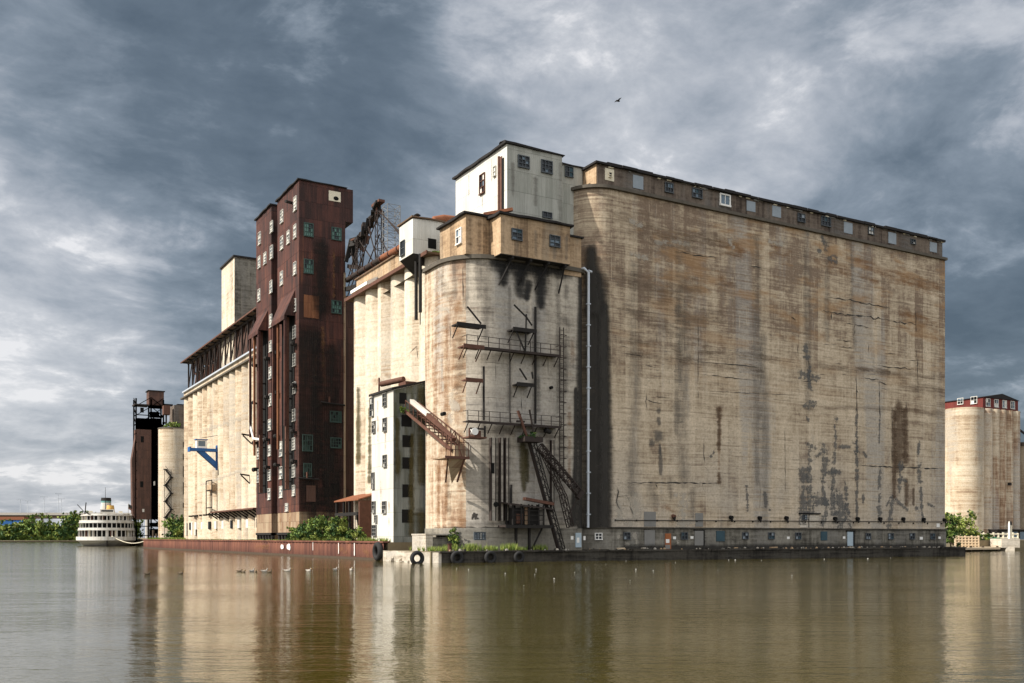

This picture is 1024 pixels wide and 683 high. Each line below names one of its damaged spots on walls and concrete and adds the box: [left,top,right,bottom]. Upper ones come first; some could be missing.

water stain [490,246,611,528]
crack [698,297,918,417]